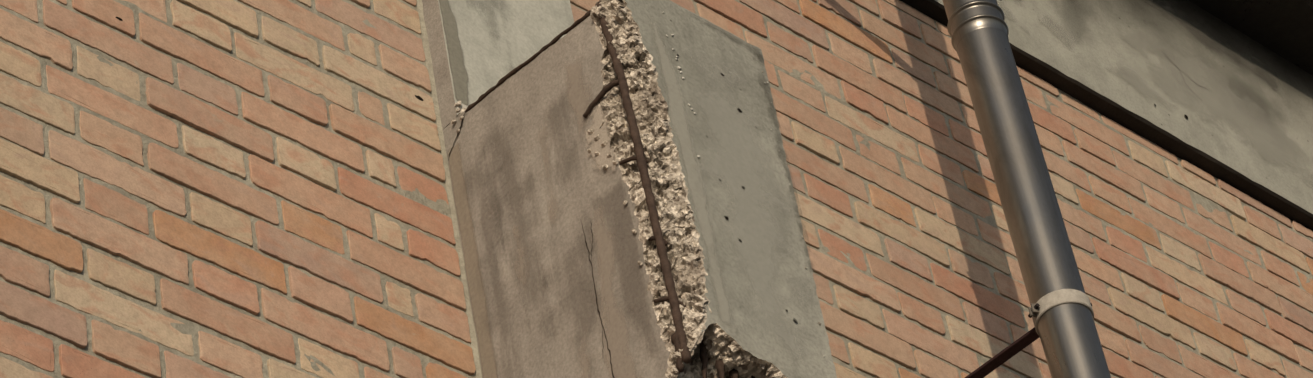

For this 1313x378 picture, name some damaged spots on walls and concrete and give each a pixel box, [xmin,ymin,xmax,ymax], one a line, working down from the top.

spalling [451,0,788,378]